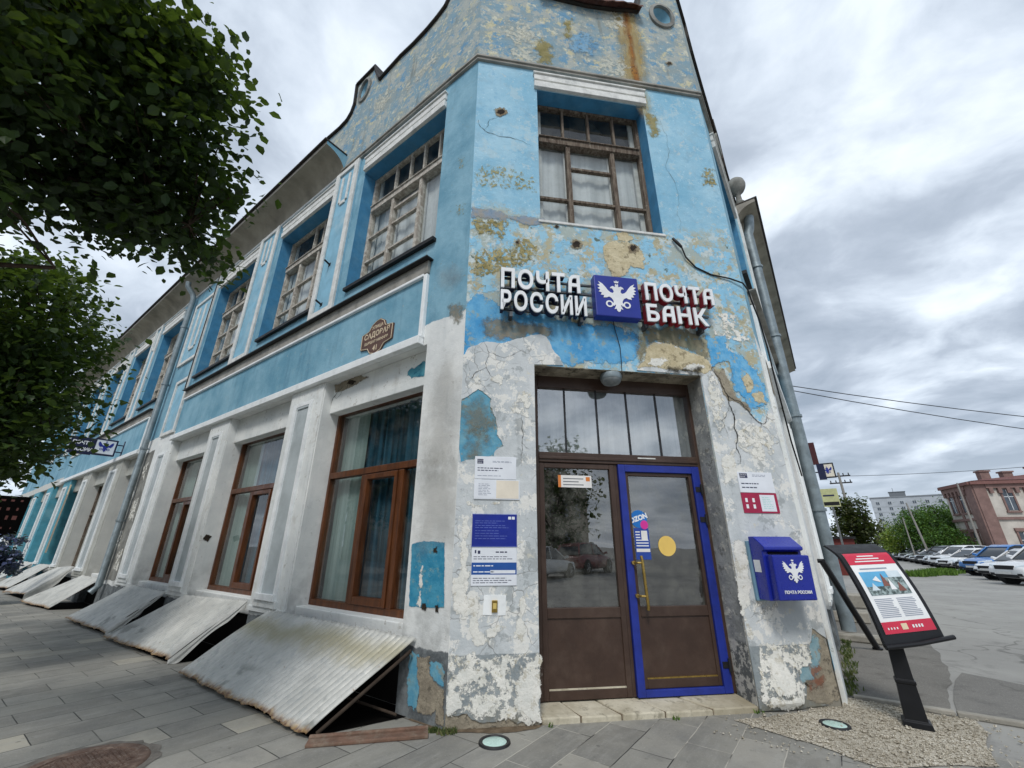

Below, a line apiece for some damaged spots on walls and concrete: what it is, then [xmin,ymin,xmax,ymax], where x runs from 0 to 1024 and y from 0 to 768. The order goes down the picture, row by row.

corrosion [615,13,658,137]
peeling [475,166,534,190]
peeling [603,232,645,277]
peeling [464,293,775,431]
peeling [459,374,503,462]
crack [711,367,768,464]
peeling [721,425,774,484]
peeling [407,518,543,730]
peeling [734,540,843,712]